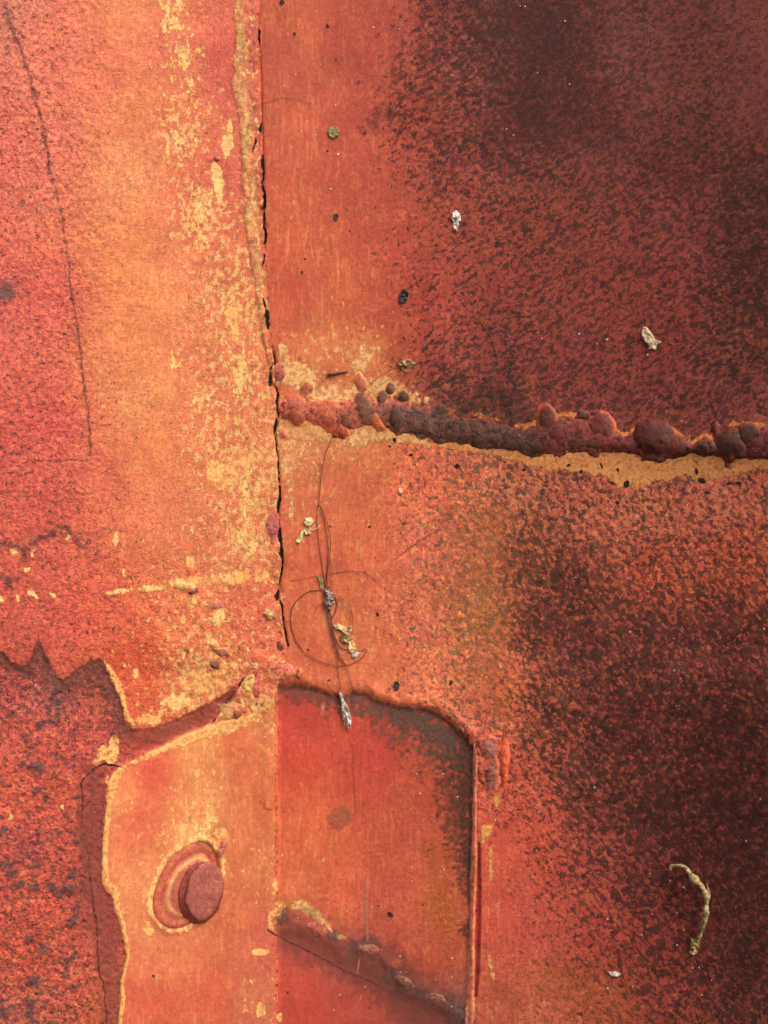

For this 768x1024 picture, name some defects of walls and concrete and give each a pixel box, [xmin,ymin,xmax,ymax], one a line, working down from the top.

crack [252,123,268,266]
crack [262,298,288,643]
peeling [0,589,56,602]
peeling [103,660,238,726]
peeling [92,714,260,1024]
peeling [244,997,283,1022]